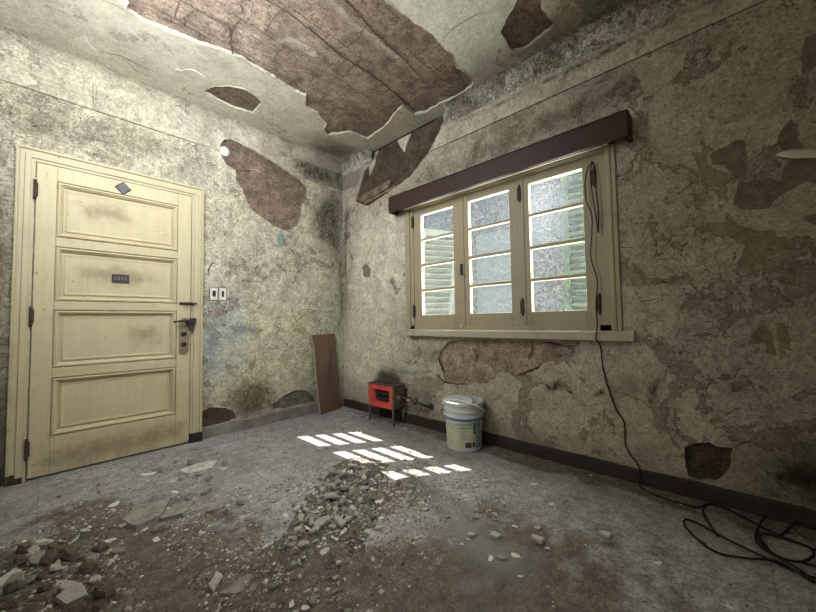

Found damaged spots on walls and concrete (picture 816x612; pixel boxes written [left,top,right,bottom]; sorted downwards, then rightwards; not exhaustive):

spalling [501,0,555,50]
spalling [125,0,474,137]
peeling [799,34,816,78]
spalling [220,140,307,230]
spalling [356,115,444,206]
peeling [693,119,816,210]
peeling [724,213,796,269]
spalling [437,339,576,385]
peeling [745,321,792,357]
spalling [683,441,750,480]